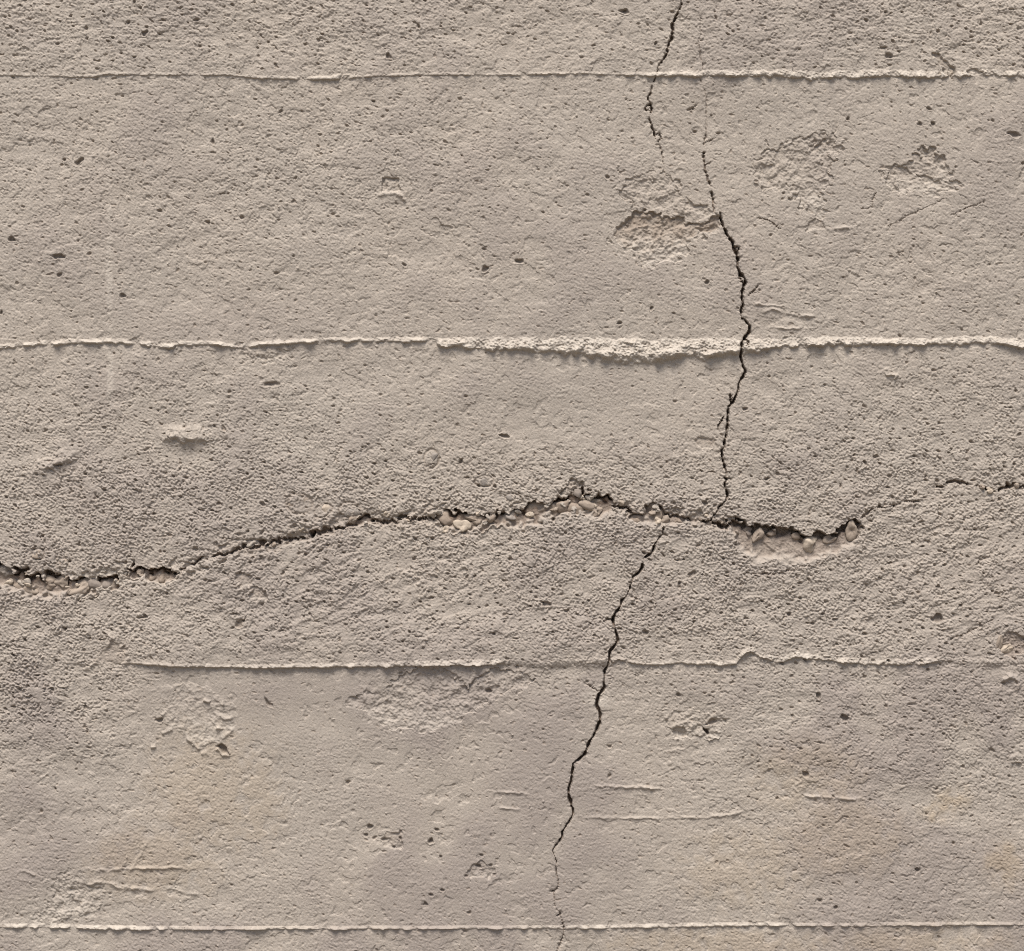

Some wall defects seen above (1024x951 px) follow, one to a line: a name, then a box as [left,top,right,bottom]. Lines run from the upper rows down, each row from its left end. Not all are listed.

crack [758,217,782,230]
crack [860,192,986,228]
crack [0,0,760,951]
crack [861,479,1024,520]
crack [746,565,808,577]
crack [950,618,996,642]